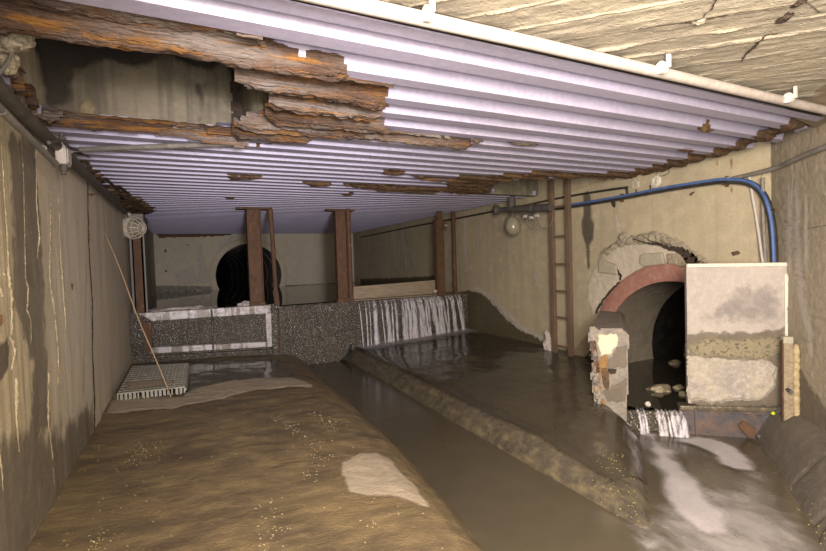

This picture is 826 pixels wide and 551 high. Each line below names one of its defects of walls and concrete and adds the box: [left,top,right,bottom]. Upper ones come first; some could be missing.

spalling [0,33,36,76]
crack [639,0,824,62]
spalling [80,101,95,114]
rust [340,118,809,196]
spalling [600,230,708,264]
damp [0,129,94,551]